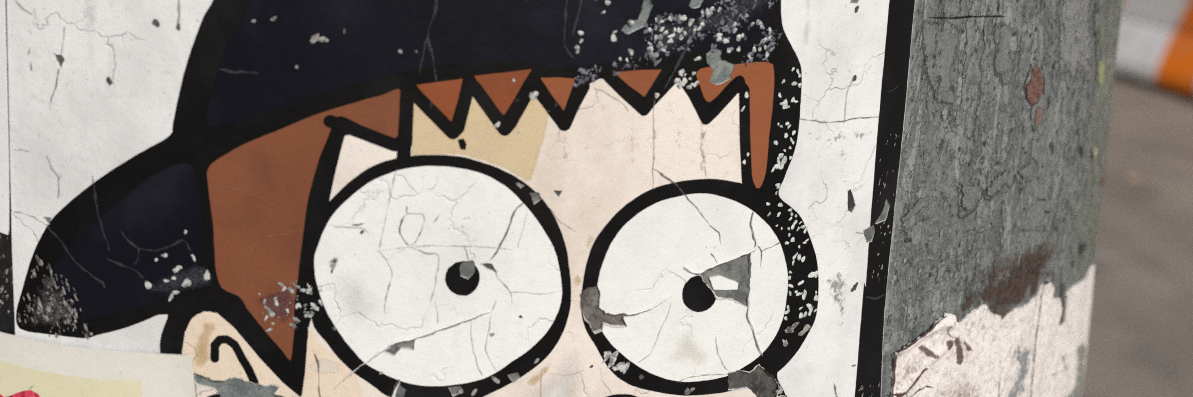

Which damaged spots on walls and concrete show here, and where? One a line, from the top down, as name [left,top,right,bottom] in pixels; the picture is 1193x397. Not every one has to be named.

corrosion [1025,63,1047,134]
corrosion [957,243,1055,321]